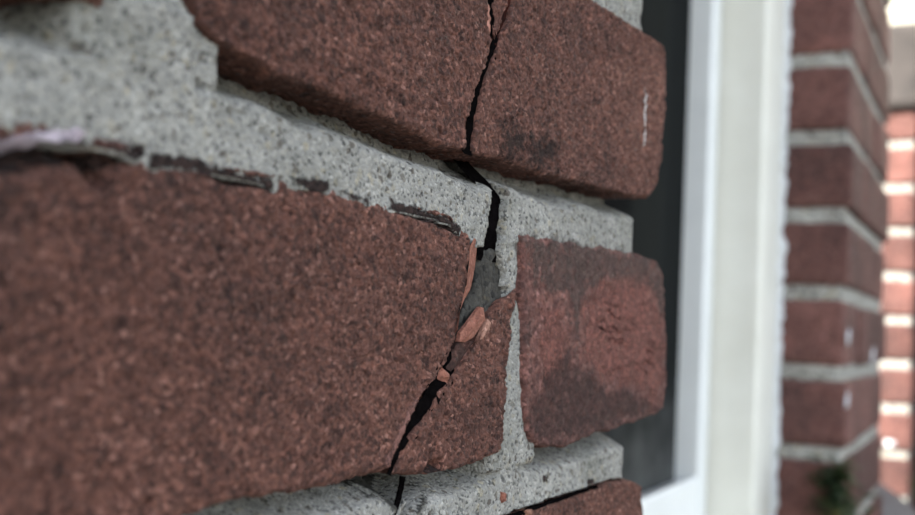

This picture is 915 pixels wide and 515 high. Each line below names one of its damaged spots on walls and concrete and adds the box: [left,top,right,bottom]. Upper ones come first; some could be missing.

crack [383,0,511,515]
crack [508,484,599,515]